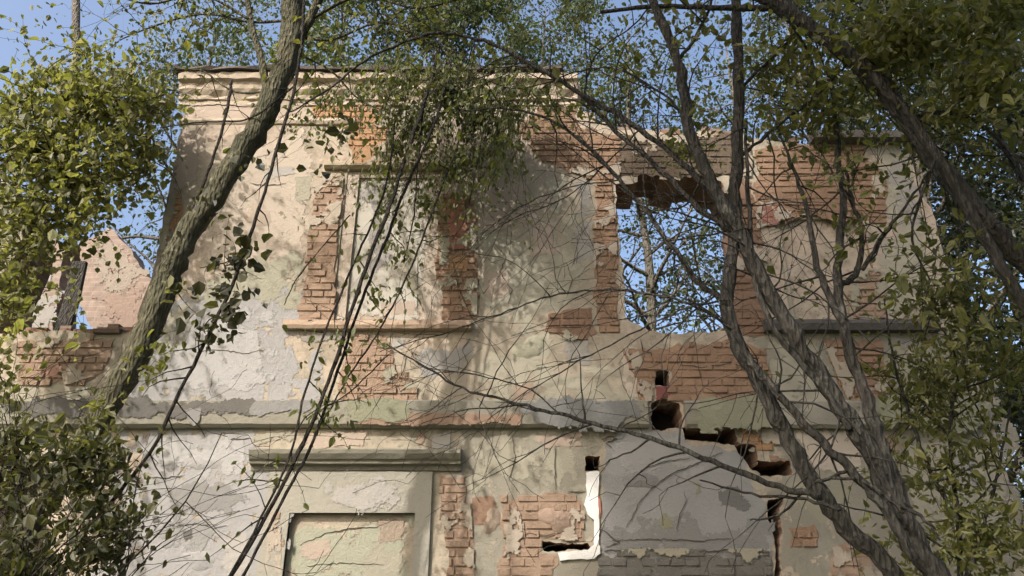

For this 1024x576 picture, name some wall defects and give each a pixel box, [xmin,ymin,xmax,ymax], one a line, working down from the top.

flaking render [200,103,560,320]
spalling [515,101,928,340]
spalling [16,228,150,386]
spalling [307,334,522,449]
spalling [622,339,779,477]
spalling [734,248,827,401]
spalling [439,474,476,576]
spalling [497,465,774,576]
spalling [789,524,818,549]